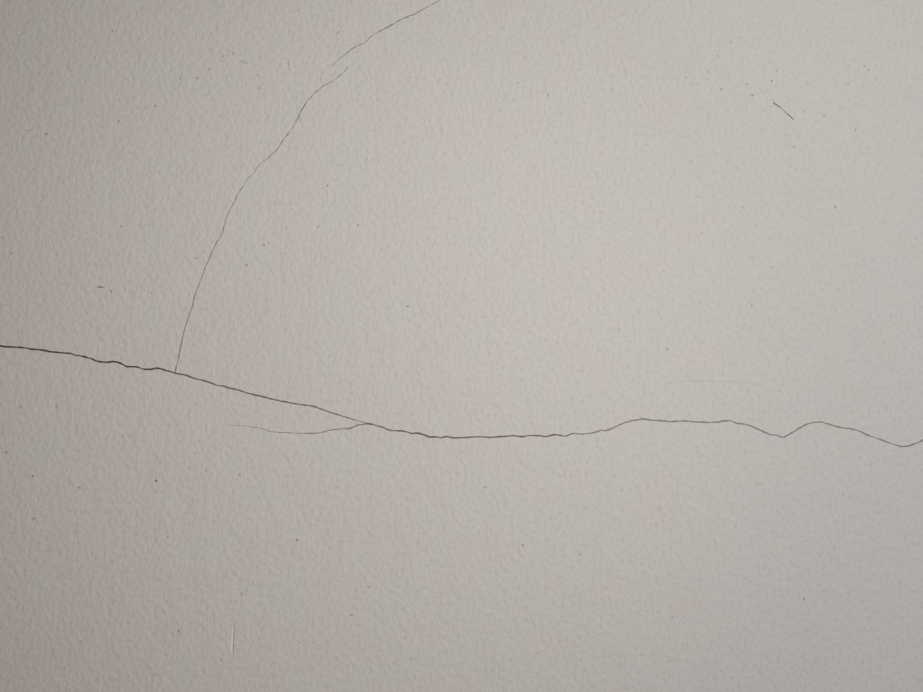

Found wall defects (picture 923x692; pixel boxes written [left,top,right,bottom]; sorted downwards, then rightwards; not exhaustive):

crack [0,0,923,447]